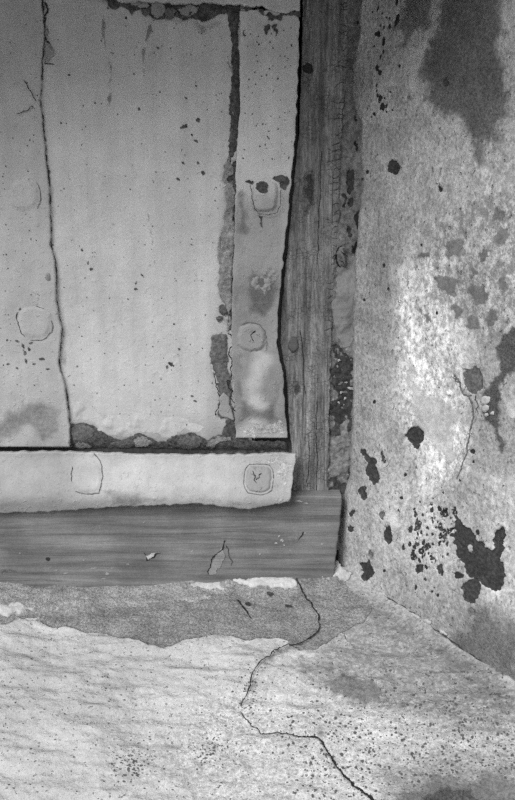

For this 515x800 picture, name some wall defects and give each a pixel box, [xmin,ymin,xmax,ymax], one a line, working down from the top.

damp [395,0,508,165]
crack [16,0,71,446]
peeling [70,175,292,487]
peeling [329,344,353,436]
crack [453,368,478,478]
peeling [0,540,386,650]
damp [387,509,401,532]
crack [240,579,374,800]